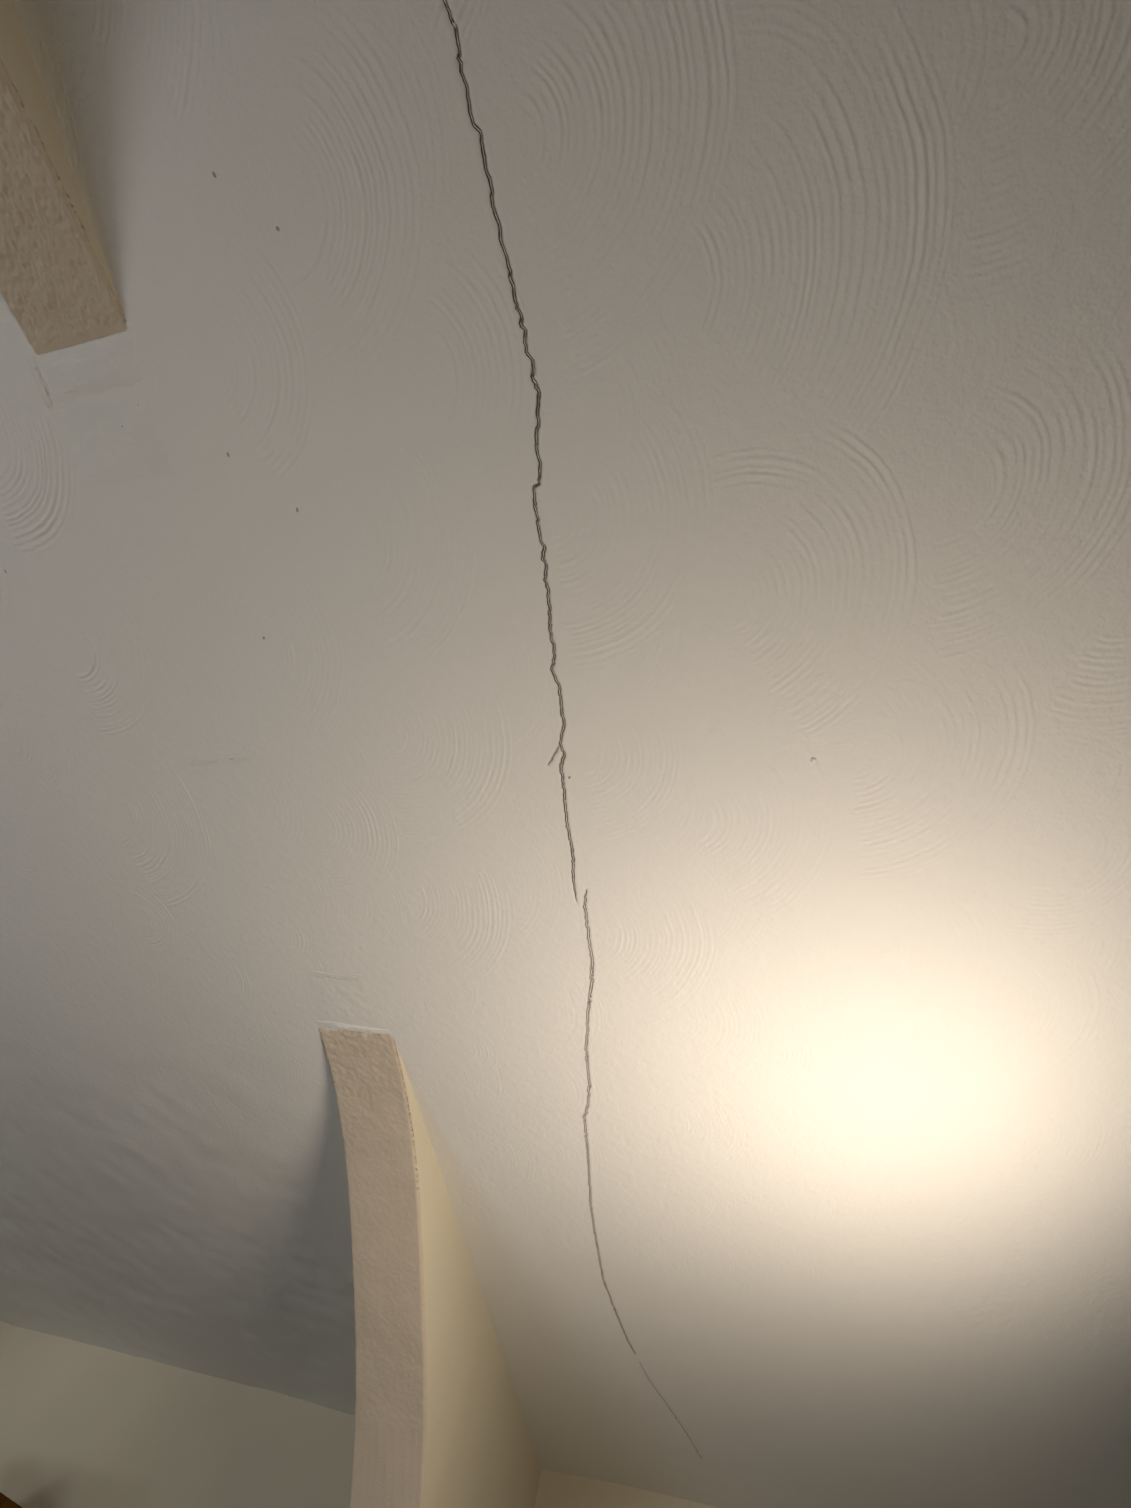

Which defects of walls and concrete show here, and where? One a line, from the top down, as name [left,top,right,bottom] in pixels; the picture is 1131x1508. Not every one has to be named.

crack [443,0,701,1457]